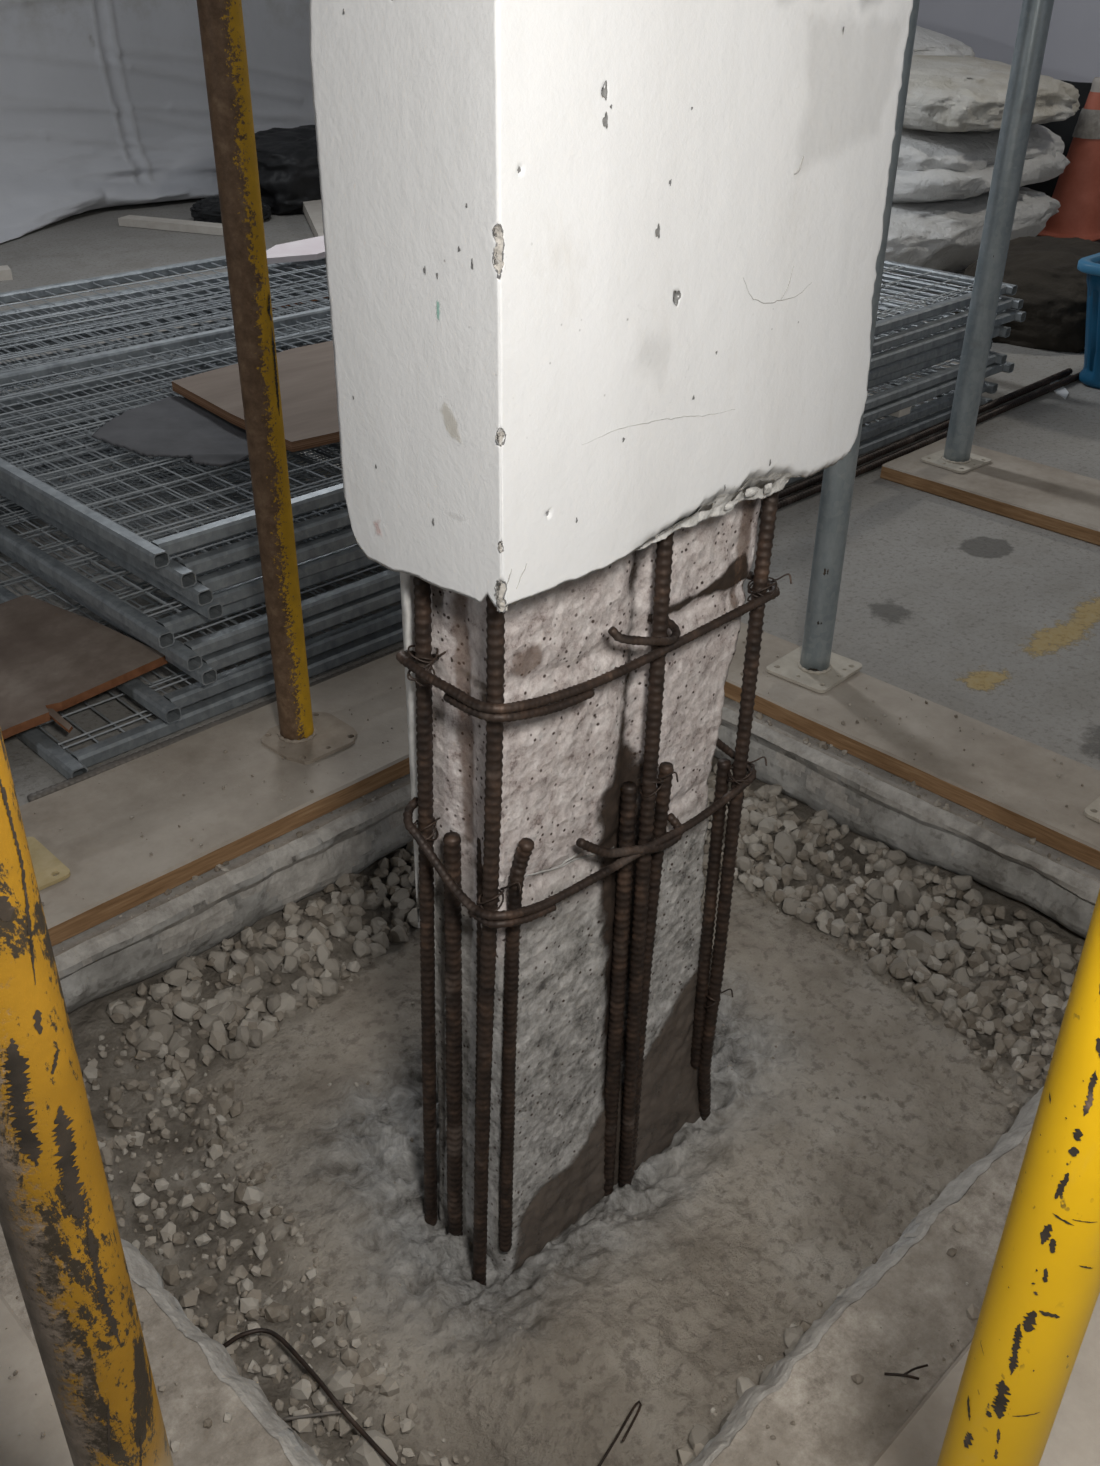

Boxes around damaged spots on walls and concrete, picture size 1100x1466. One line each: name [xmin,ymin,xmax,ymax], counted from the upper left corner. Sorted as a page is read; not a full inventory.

rust [629,551,638,591]
rust [668,553,748,614]
rust [596,652,644,1099]